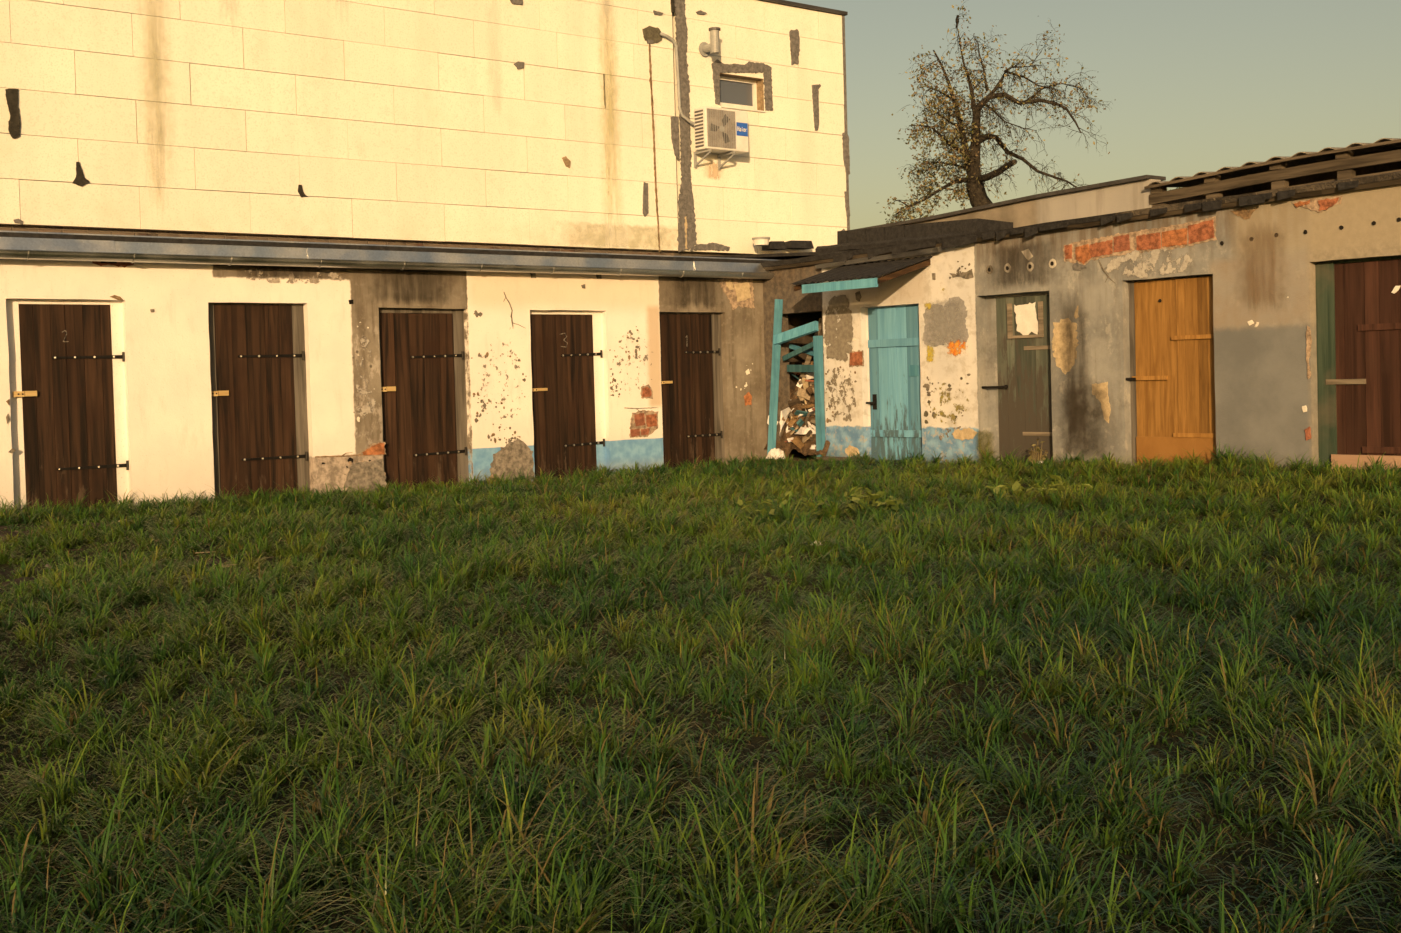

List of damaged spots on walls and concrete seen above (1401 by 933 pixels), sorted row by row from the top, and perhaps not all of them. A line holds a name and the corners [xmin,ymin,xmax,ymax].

peeling [932,261,1009,280]
flaking render [1050,207,1257,278]
spalling [471,342,534,484]
crack [503,292,525,328]
flaking render [609,326,658,438]
peeling [823,291,864,423]
peeling [1052,306,1079,375]